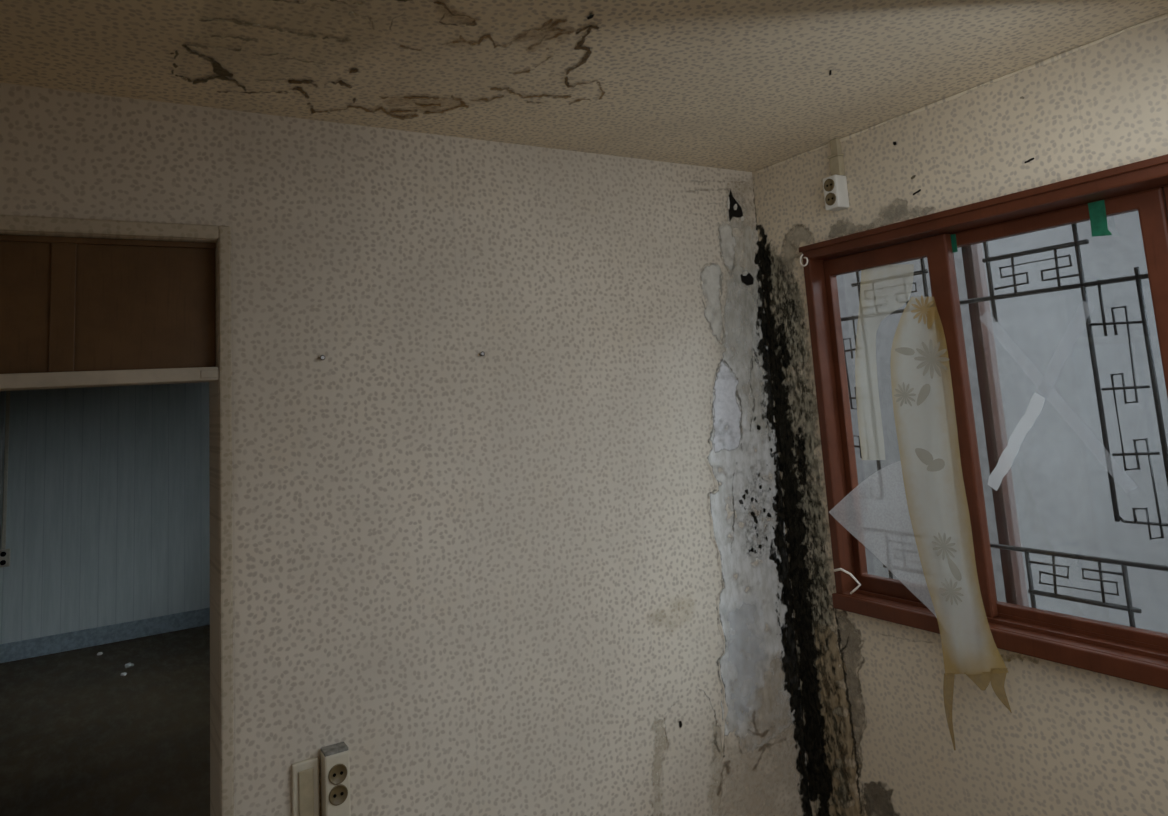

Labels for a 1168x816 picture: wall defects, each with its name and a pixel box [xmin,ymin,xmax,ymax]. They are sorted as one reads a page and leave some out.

spalling [740,271,754,285]
peeling [713,360,755,453]
water stain [701,224,899,816]